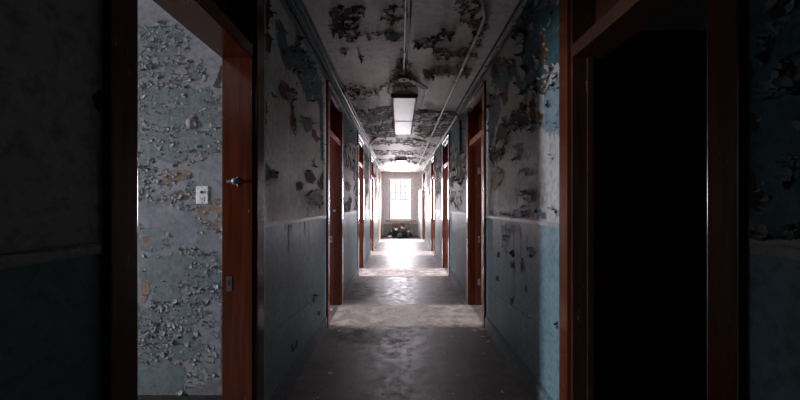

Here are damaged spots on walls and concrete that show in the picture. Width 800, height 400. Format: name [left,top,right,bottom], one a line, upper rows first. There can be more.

peeling [138,20,222,396]
peeling [264,0,326,213]
peeling [328,0,493,213]
peeling [485,0,559,192]